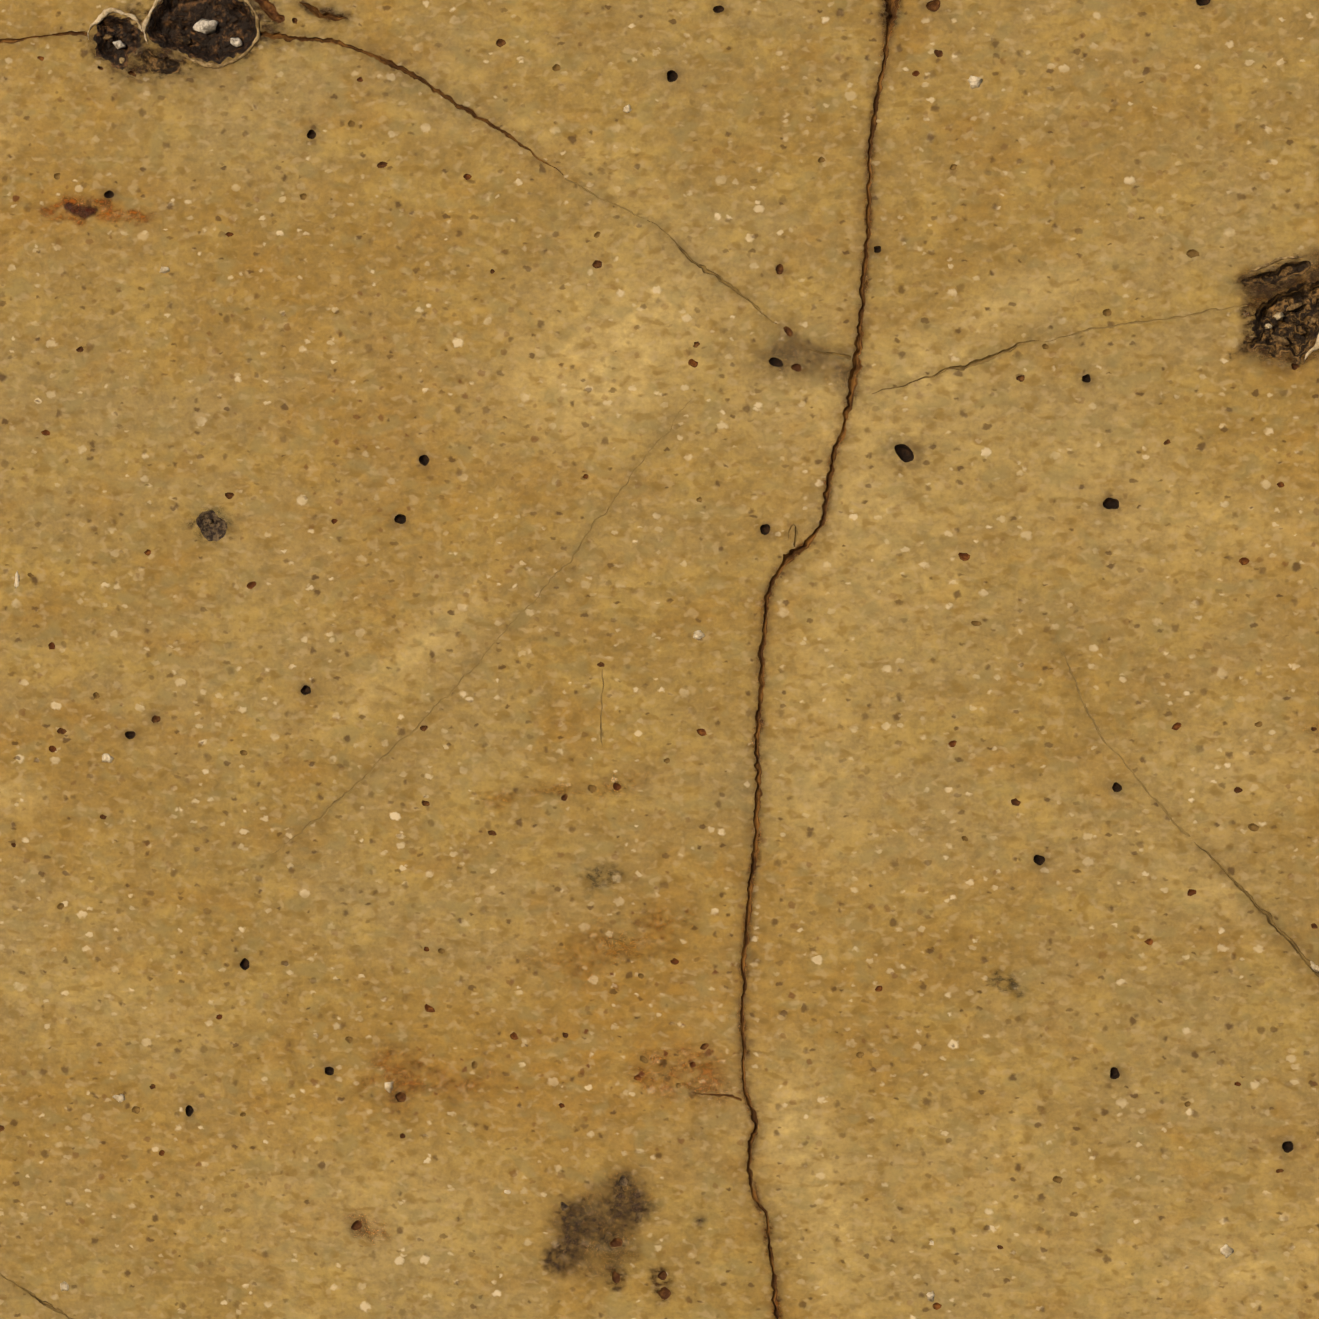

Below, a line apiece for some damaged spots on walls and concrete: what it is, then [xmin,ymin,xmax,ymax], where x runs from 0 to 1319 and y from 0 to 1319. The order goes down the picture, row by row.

crack [0,31,88,44]
spalling [87,0,298,77]
rust [41,197,146,225]
spalling [1237,254,1319,370]
crack [260,0,1247,1319]
crack [1056,638,1319,977]
water stain [544,1174,649,1291]
crack [0,1273,73,1319]